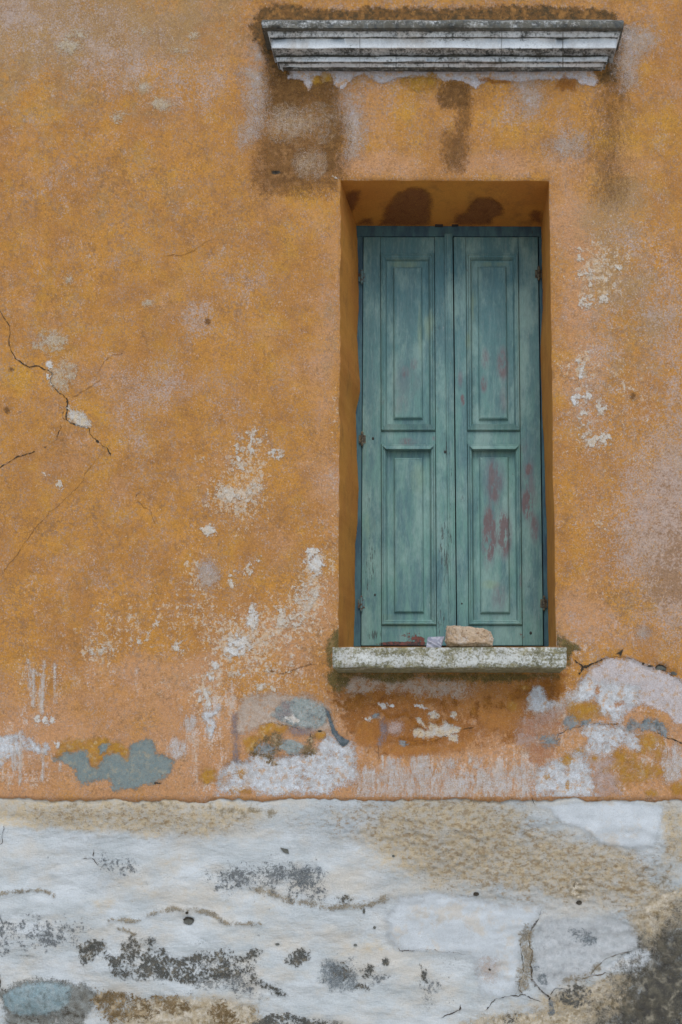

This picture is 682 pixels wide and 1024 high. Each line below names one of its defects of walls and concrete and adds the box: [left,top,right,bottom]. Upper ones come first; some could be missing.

leakage [231,1,666,226]
crack [0,311,122,569]
peeling [213,426,285,508]
peeling [165,602,360,797]
spalling [377,702,477,759]
peeling [525,650,682,797]
crack [575,656,680,681]
leakage [212,856,354,908]
leakage [0,913,286,1000]
leakage [284,947,389,993]
crack [487,912,627,1009]
leakage [548,898,682,1024]